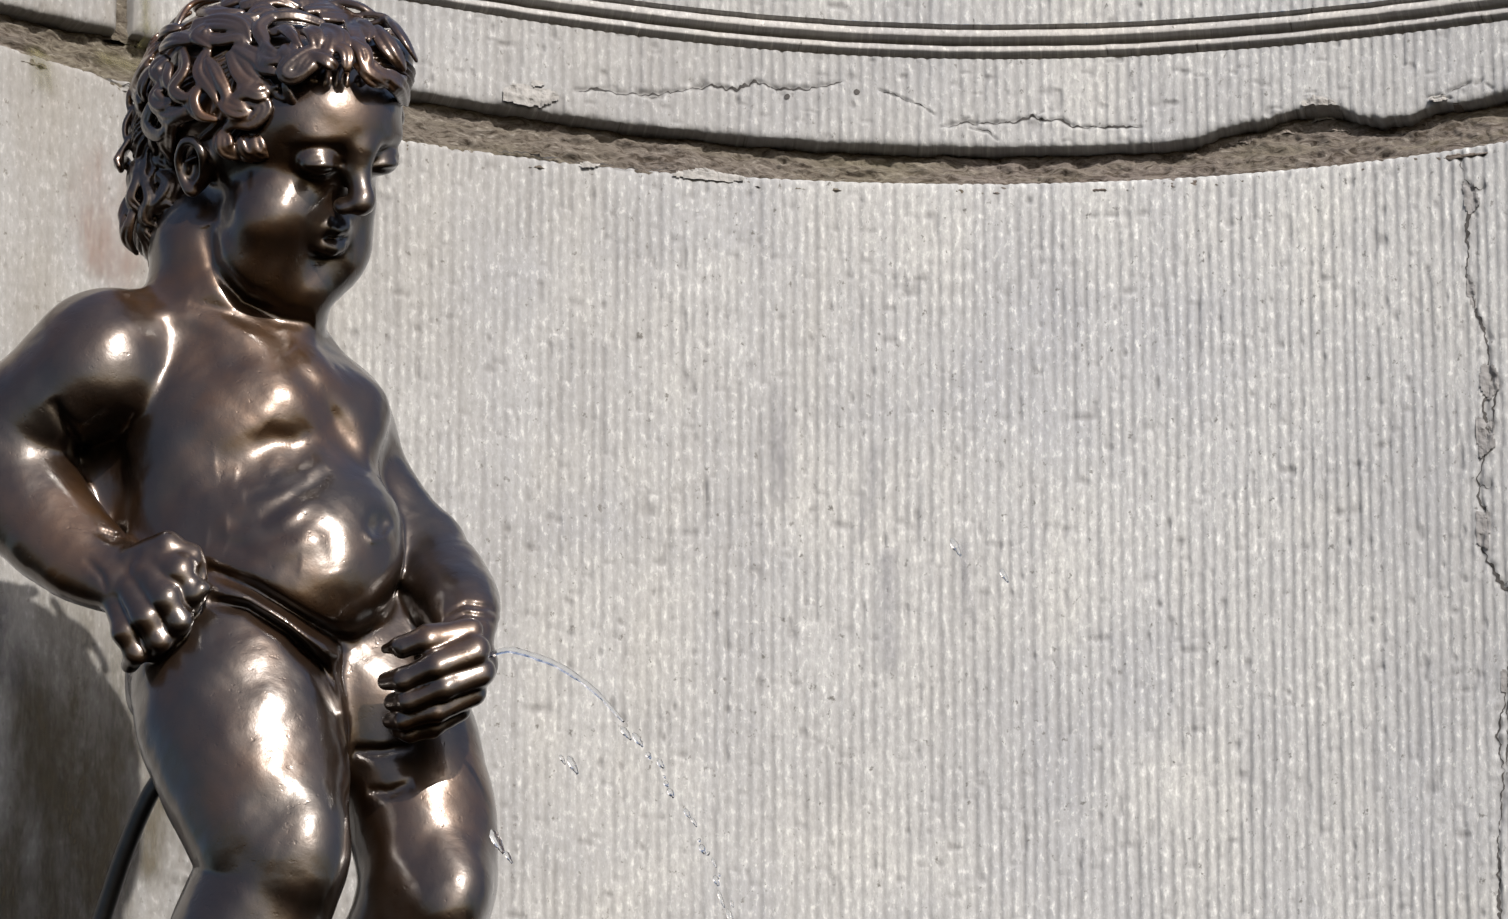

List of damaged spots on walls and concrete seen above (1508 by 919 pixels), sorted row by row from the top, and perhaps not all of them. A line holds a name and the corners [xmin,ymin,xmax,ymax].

crack [577,79,839,98]
crack [879,90,1139,135]
spalling [1216,95,1351,150]
spalling [1428,95,1465,113]
spalling [673,168,744,182]
crack [1459,159,1508,591]
leakage [16,667,121,919]
crack [1495,666,1508,919]
leakage [142,798,163,874]